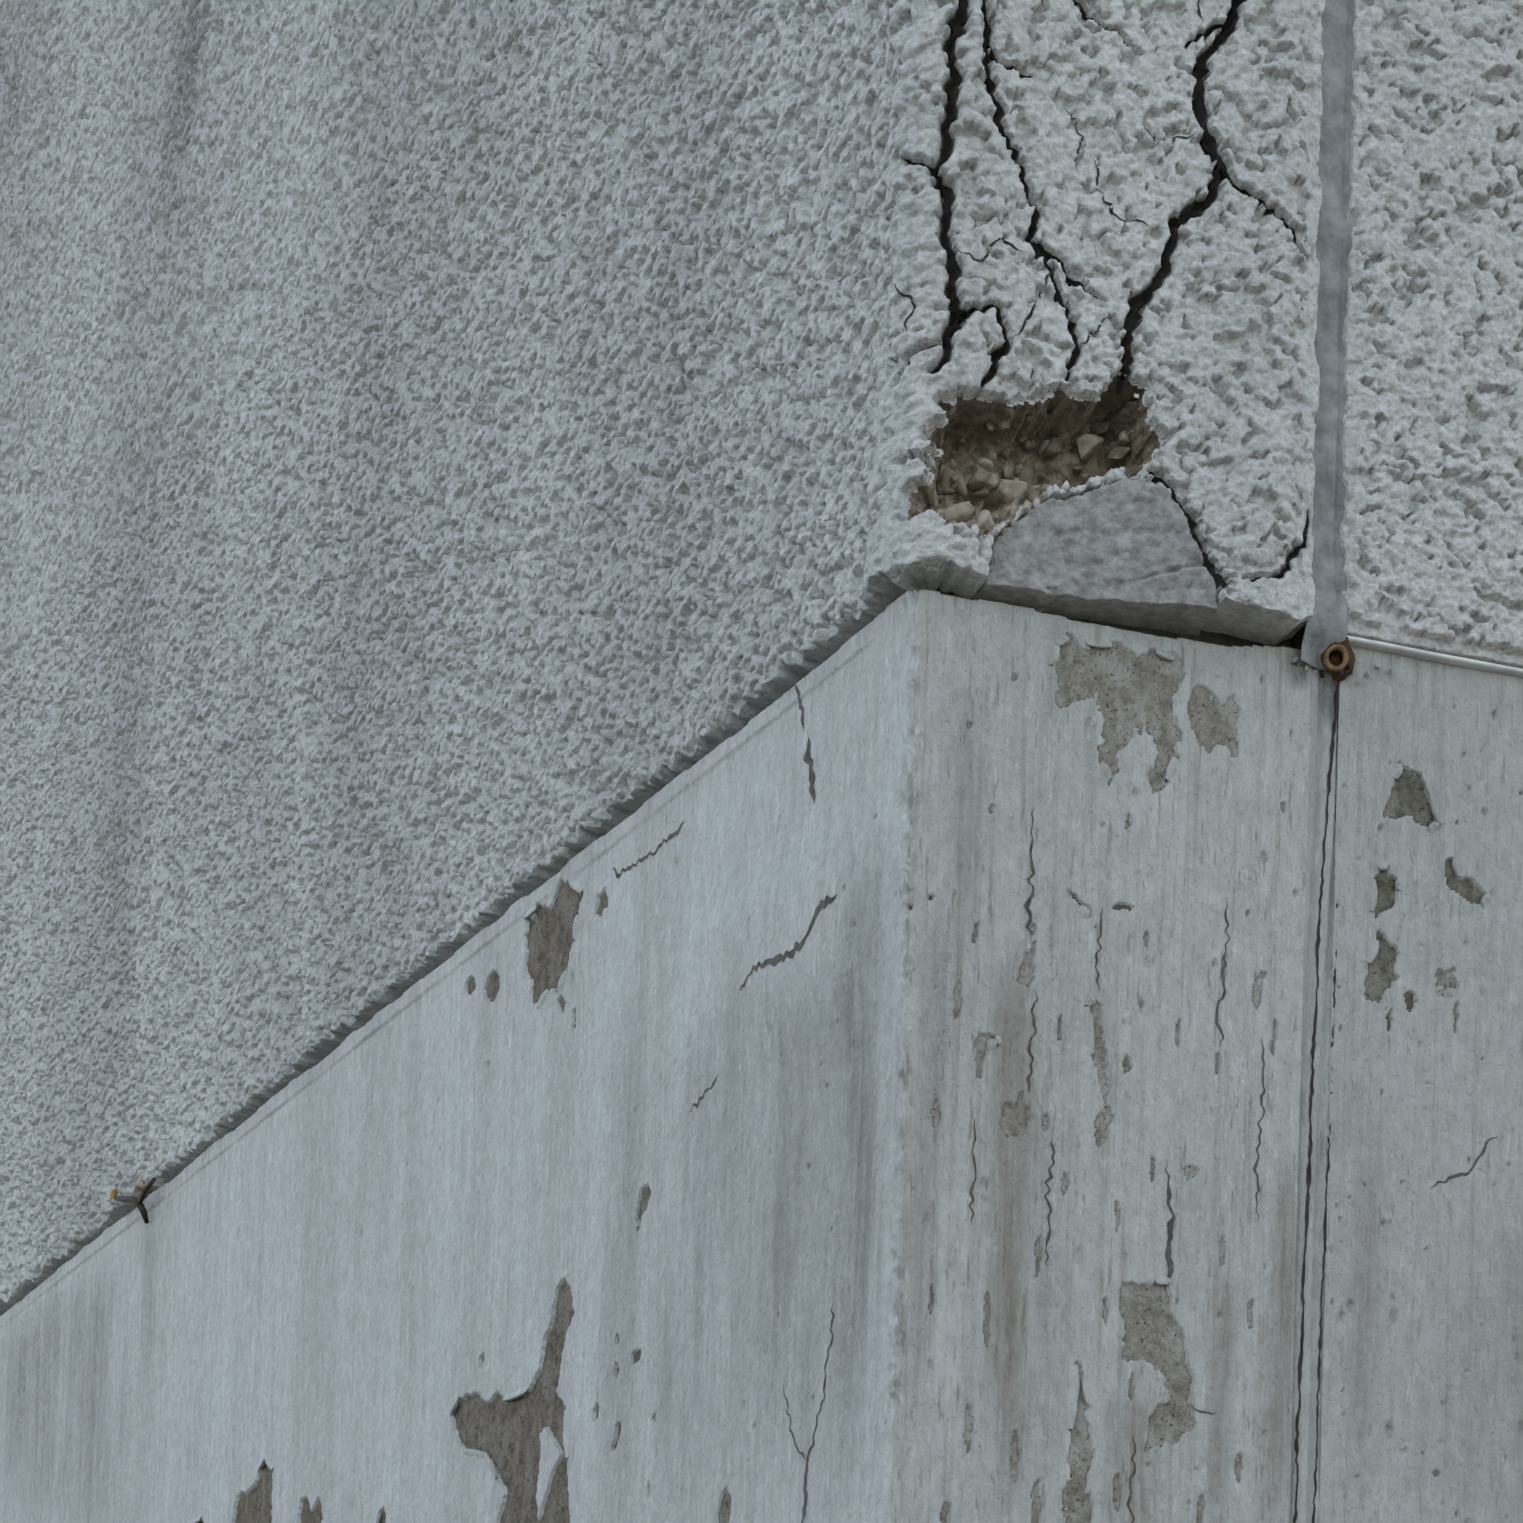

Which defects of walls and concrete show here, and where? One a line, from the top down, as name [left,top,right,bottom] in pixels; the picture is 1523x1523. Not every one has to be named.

crack [893,0,1307,394]
spalling [908,371,1239,794]
crack [1148,471,1309,589]
crack [795,684,815,801]
peeling [523,873,608,1028]
crack [739,895,836,992]
crack [1024,808,1035,935]
peeling [1364,860,1415,1032]
crack [1165,1166,1176,1286]
peeling [450,1281,575,1523]
peeling [1102,1276,1194,1452]
peeling [235,1454,274,1523]